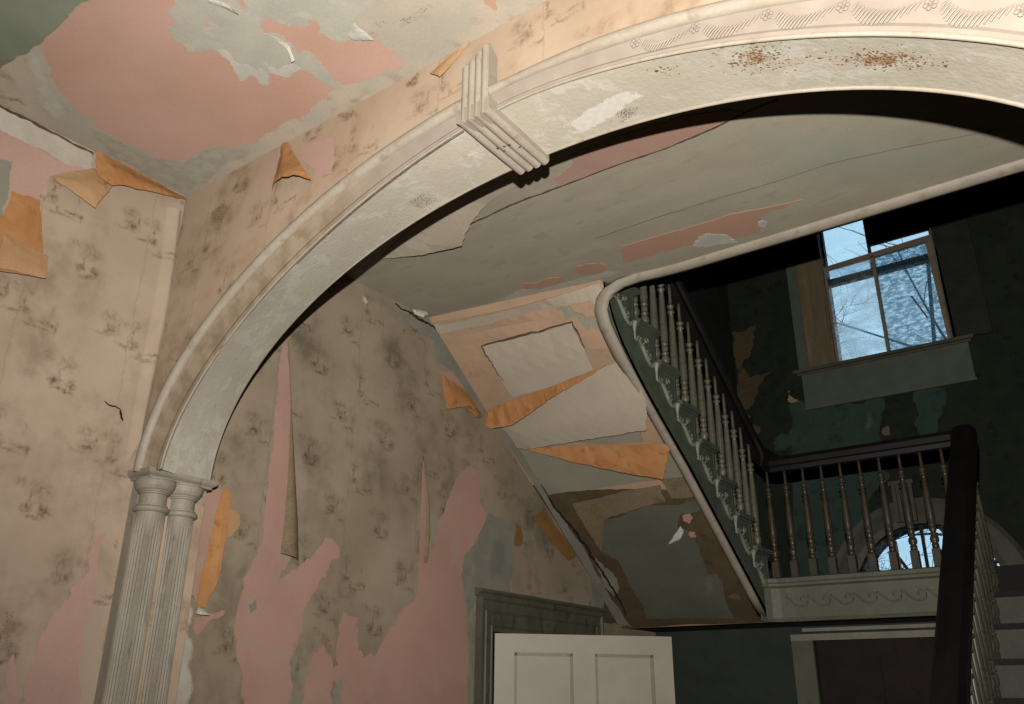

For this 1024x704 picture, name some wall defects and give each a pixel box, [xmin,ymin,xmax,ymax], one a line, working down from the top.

flaking render [39,0,406,162]
rust [711,42,948,77]
flaking render [0,108,93,201]
flaking render [297,136,335,177]
flaking render [620,199,802,263]
crack [595,129,999,239]
peeling [399,263,606,417]
peeling [732,325,771,435]
flaking render [193,338,488,704]
peeling [497,427,762,628]